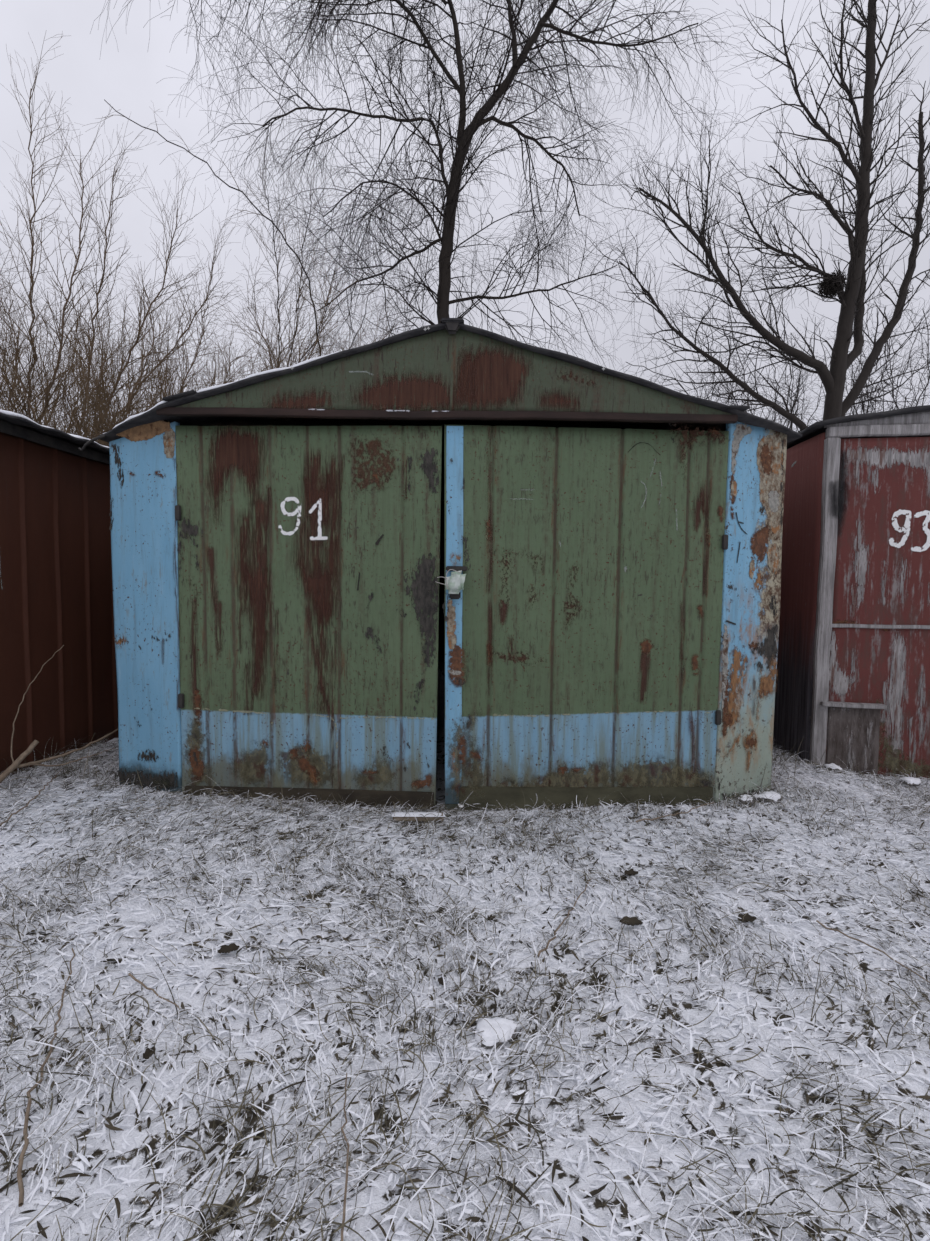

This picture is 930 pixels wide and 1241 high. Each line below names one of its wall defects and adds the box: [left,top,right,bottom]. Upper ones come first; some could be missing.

corrosion [352,354,476,411]
peeling [730,424,785,539]
peeling [847,447,930,497]
corrosion [174,520,209,786]
corrosion [207,427,278,711]
corrosion [296,437,396,786]
corrosion [448,644,466,687]
peeling [749,623,779,677]
peeling [829,631,859,711]
peeling [850,520,907,617]
peeling [847,631,926,772]
corrosion [234,740,271,784]